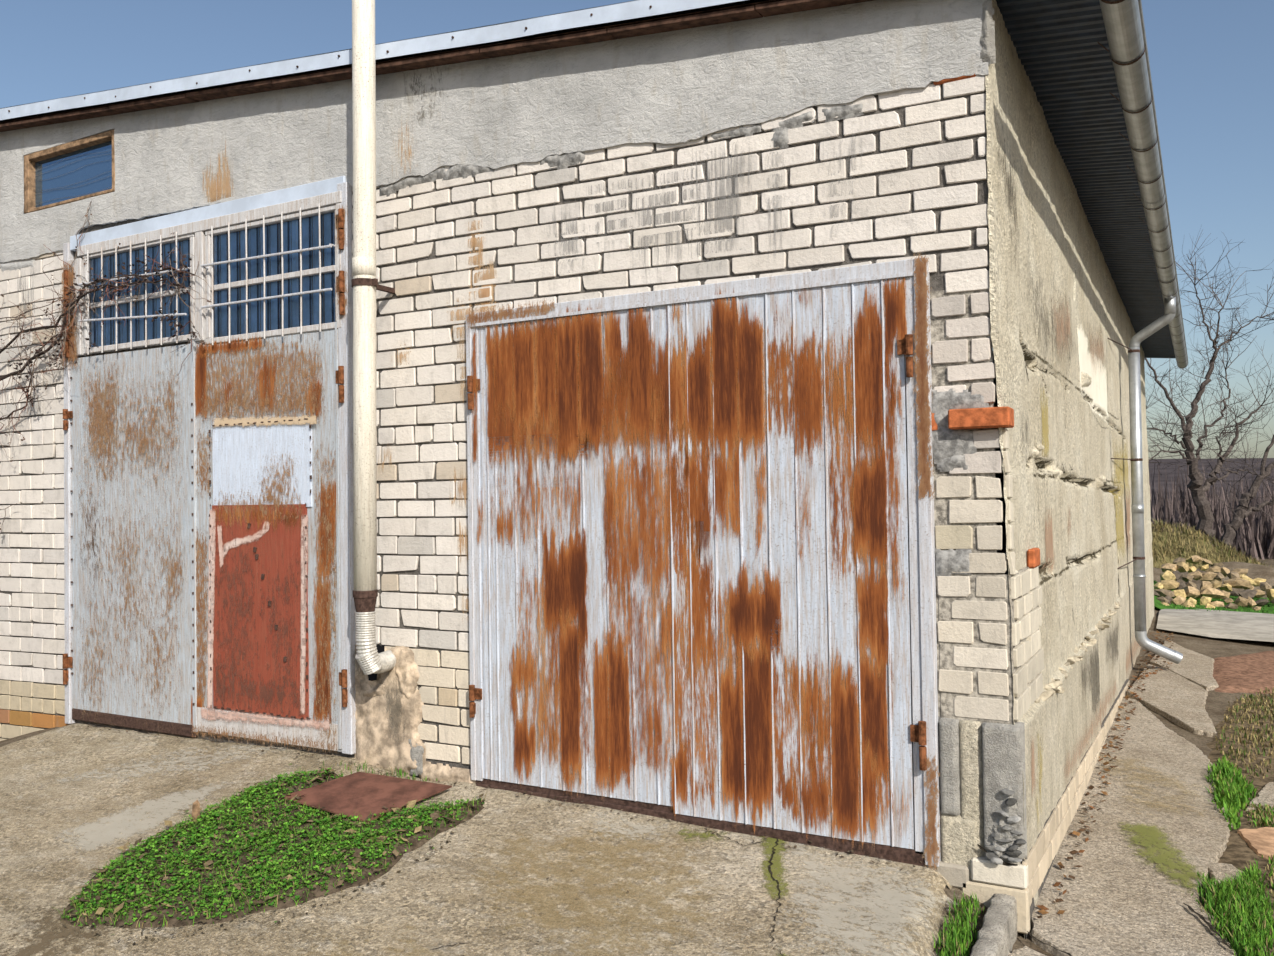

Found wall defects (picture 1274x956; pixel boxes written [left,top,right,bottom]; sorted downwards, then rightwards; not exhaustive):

peeling [711,104,864,149]
corrosion [203,149,231,203]
peeling [379,164,495,197]
peeling [540,152,585,170]
corrosion [60,261,338,751]
corrosion [450,221,935,845]
corrosion [923,755,941,870]